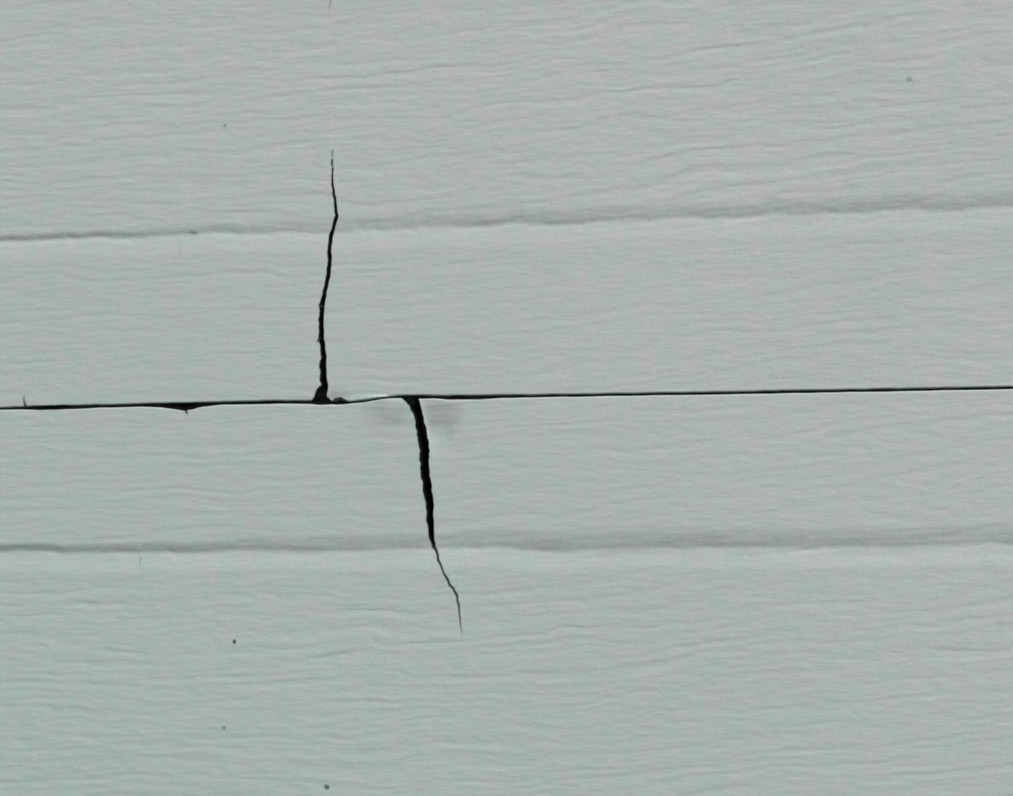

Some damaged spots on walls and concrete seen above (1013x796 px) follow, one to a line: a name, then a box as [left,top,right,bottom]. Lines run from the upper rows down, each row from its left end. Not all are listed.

crack [312,159,346,401]
crack [402,396,461,623]